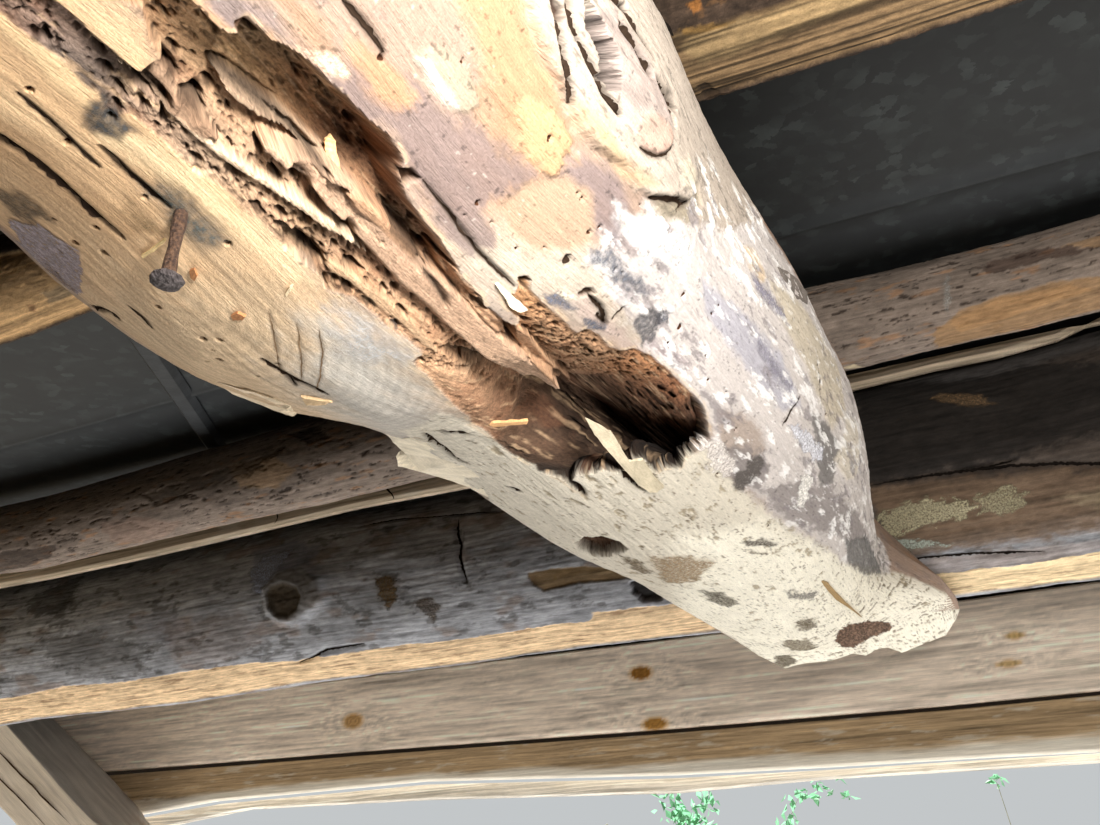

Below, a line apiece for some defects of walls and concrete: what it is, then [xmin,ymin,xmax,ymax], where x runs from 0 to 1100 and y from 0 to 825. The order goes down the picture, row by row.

crack [342,0,384,52]
crack [554,4,619,115]
crack [611,0,672,119]
crack [1,134,123,235]
crack [18,92,165,201]
crack [639,145,672,157]
spalling [0,0,736,492]
crack [262,311,328,395]